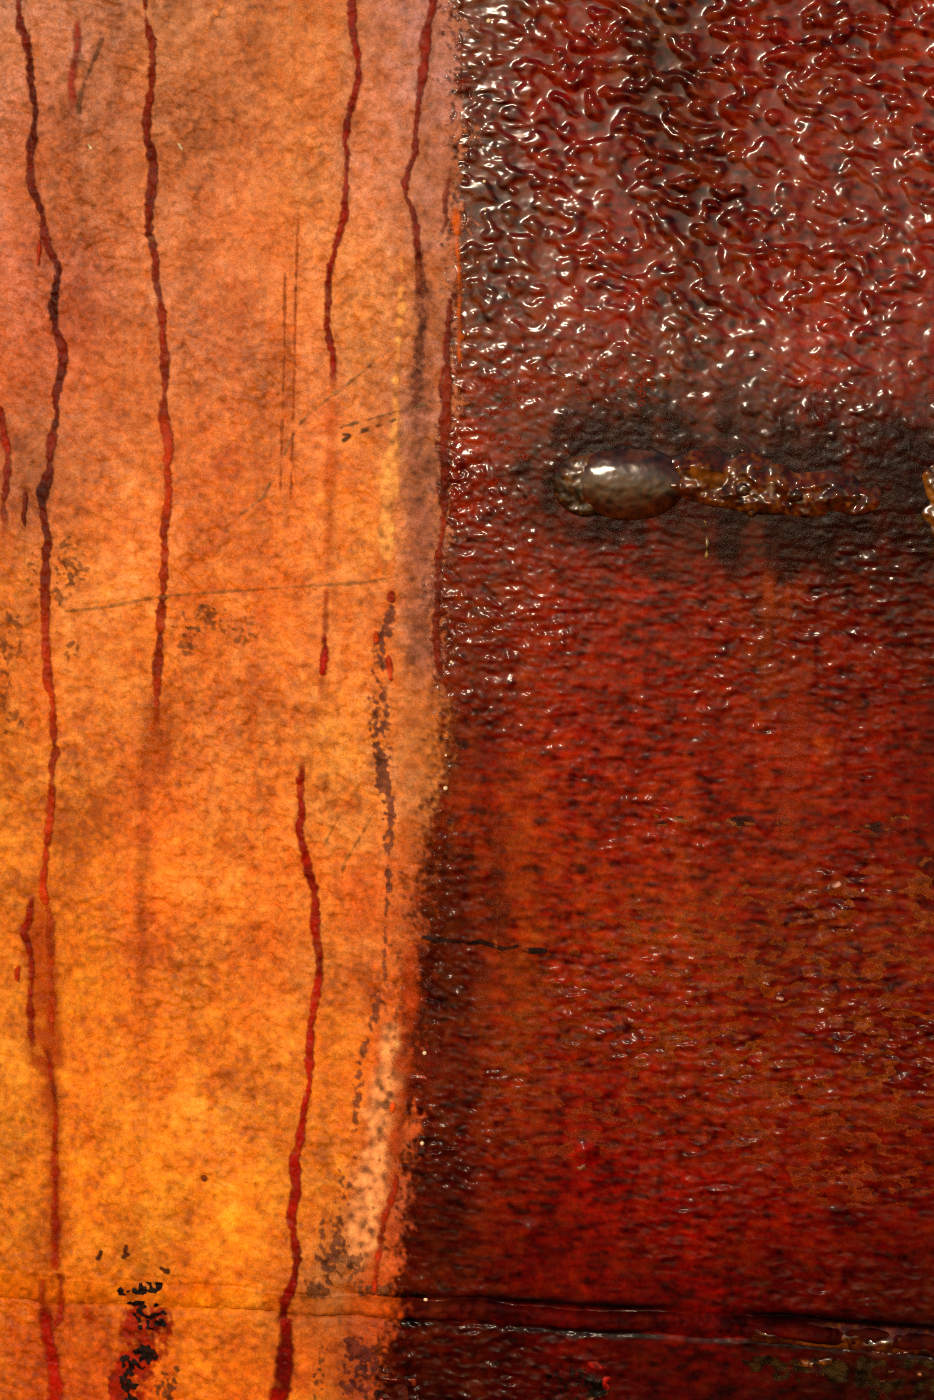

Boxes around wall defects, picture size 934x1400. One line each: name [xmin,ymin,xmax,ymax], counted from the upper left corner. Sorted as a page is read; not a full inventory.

corrosion [68,23,80,102]
corrosion [141,0,173,714]
corrosion [324,0,361,378]
corrosion [401,0,437,268]
corrosion [0,0,68,1400]
corrosion [319,634,329,675]
corrosion [269,767,323,1400]